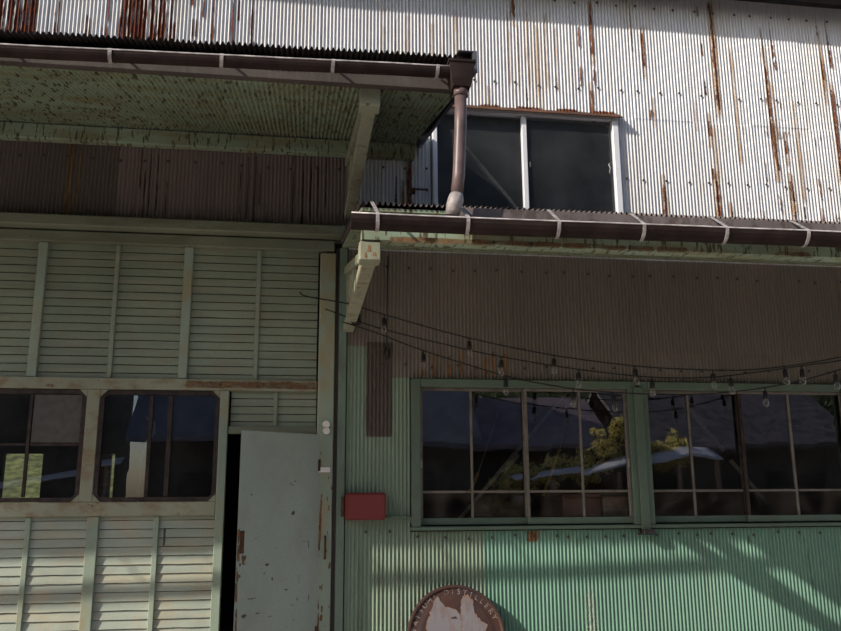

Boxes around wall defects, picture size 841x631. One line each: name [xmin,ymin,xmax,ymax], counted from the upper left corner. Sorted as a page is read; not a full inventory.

rust [0,0,38,33]
rust [118,0,175,41]
rust [191,0,215,43]
rust [701,3,721,110]
rust [760,22,789,170]
rust [828,90,841,174]
rust [395,161,412,205]
rust [712,168,737,218]